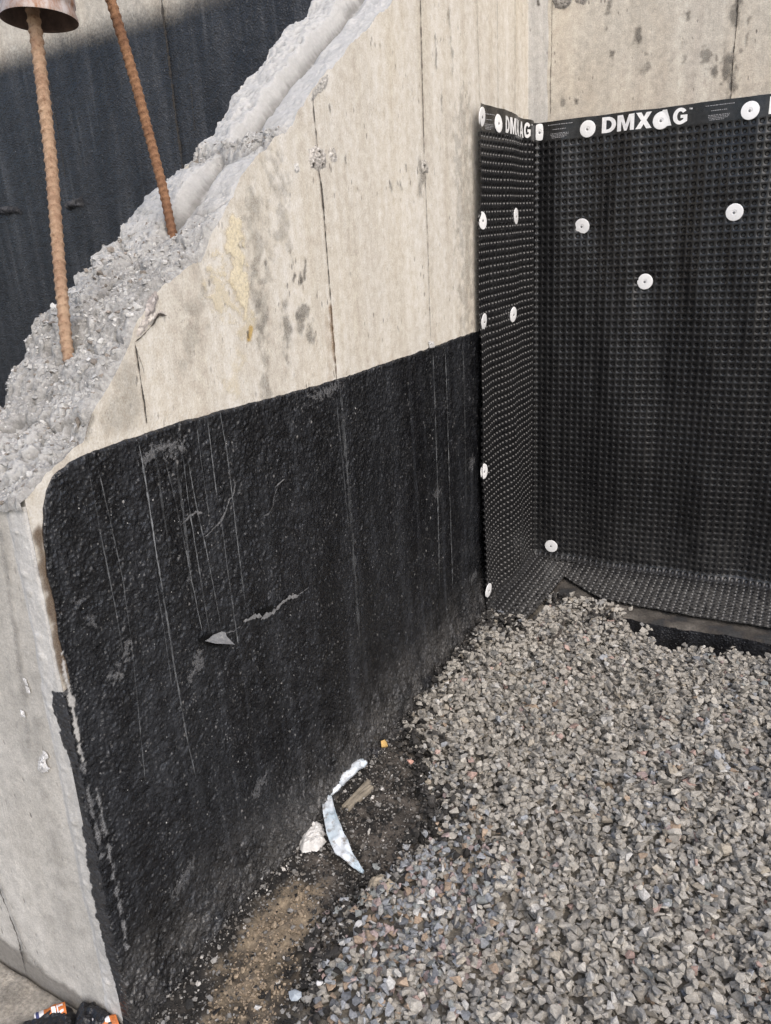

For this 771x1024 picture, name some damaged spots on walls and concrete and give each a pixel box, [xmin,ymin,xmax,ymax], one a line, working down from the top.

spalling [25,6,76,363]
spalling [105,0,177,238]
spalling [311,74,328,101]
spalling [294,145,346,173]
peeling [204,214,253,320]
crack [229,590,305,633]